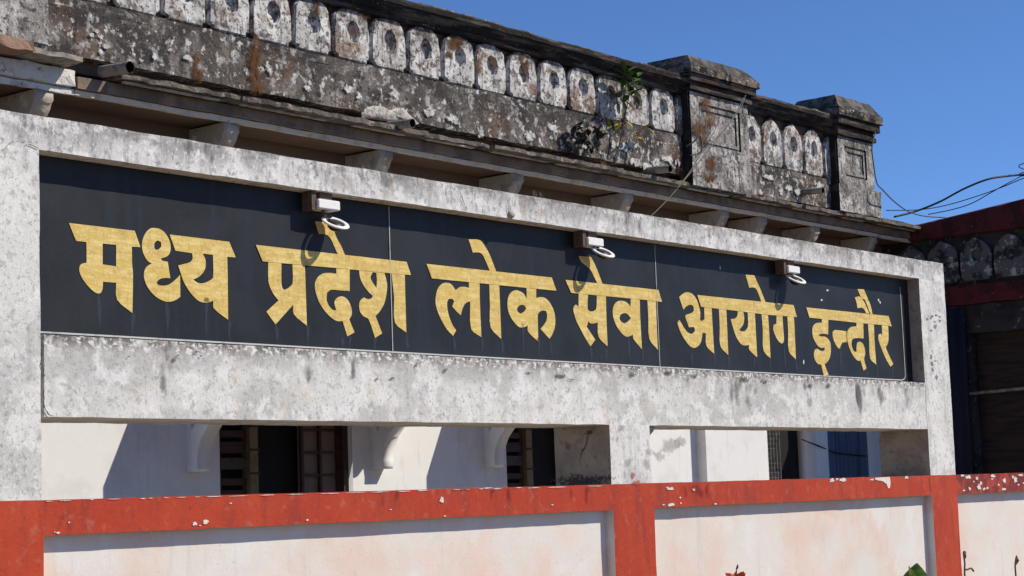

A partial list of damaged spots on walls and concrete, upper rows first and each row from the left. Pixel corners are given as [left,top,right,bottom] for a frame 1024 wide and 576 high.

rust [192,53,204,83]
rust [248,29,266,93]
rust [694,96,717,182]
peeling [961,474,1024,491]